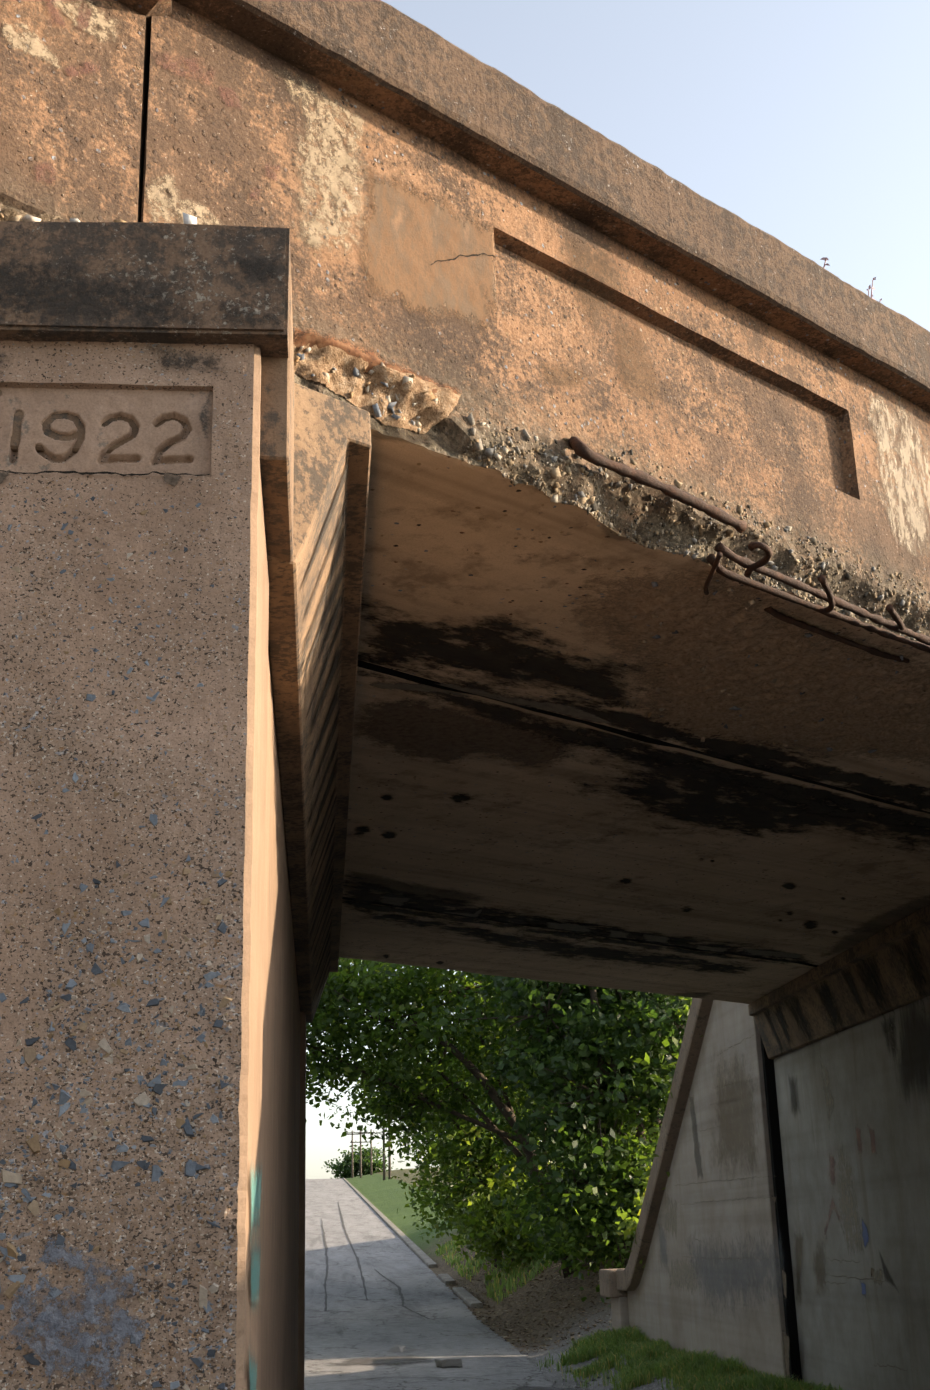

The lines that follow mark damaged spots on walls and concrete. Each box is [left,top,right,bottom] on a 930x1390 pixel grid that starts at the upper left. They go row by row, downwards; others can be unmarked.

spalling [0,203,79,222]
spalling [293,338,930,646]
water stain [303,461,814,997]
water stain [357,597,930,853]